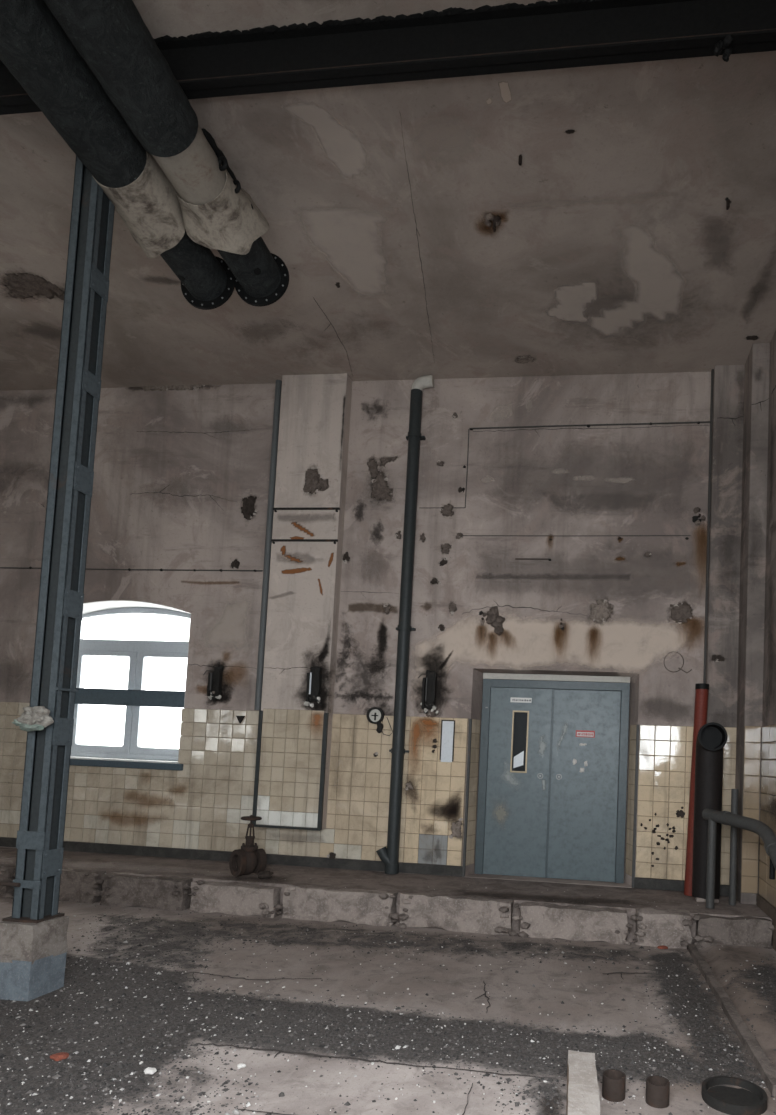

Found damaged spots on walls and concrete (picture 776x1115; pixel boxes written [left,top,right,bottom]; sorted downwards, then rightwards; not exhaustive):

peeling [548,226,683,335]
flaking render [303,467,329,495]
flaking render [367,456,398,501]
flaking render [241,496,258,520]
corrosion [477,626,511,651]
peeling [414,599,693,695]
corrosion [555,624,567,647]
corrosion [589,628,599,653]
corrosion [411,719,437,757]
crack [198,1043,563,1115]